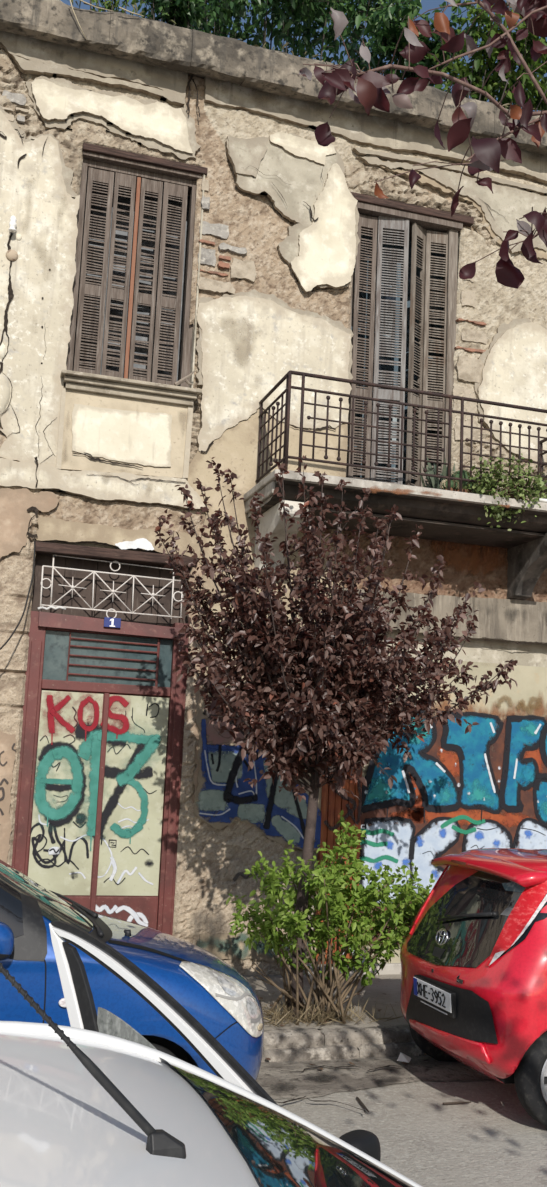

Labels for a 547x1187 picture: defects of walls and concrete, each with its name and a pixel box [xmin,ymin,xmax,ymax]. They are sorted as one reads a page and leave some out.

crack [186,73,200,117]
crack [0,233,186,538]
spalling [39,490,206,537]
flaking render [0,45,547,500]